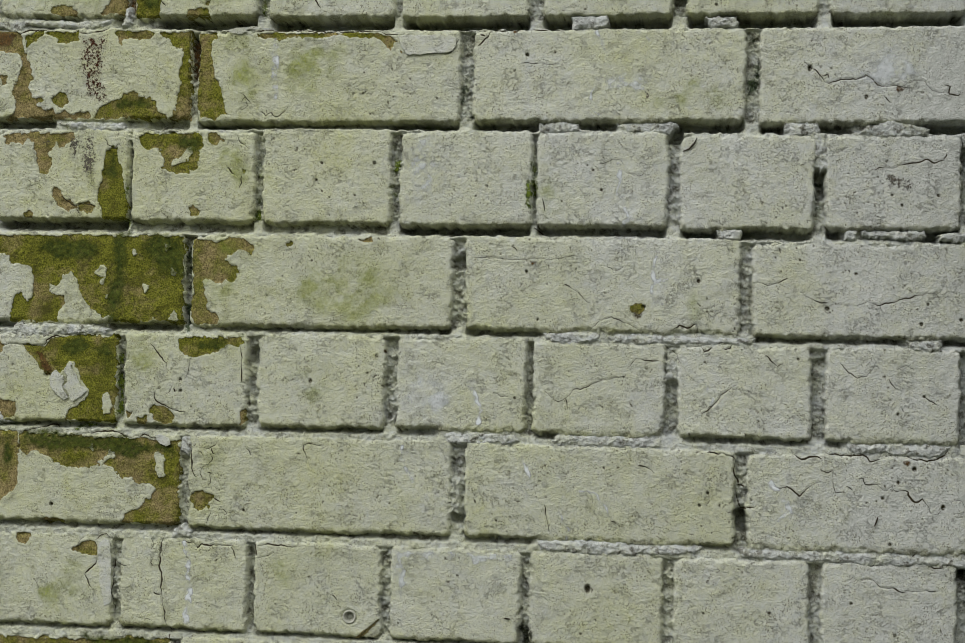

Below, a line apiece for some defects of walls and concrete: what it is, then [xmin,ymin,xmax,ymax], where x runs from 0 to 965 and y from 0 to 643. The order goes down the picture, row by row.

peeling [0,0,456,174]
crack [806,63,961,103]
peeling [52,146,131,223]
crack [872,154,947,170]
crack [859,293,937,311]
peeling [0,234,254,526]
crack [779,451,965,515]
peeling [0,634,171,643]